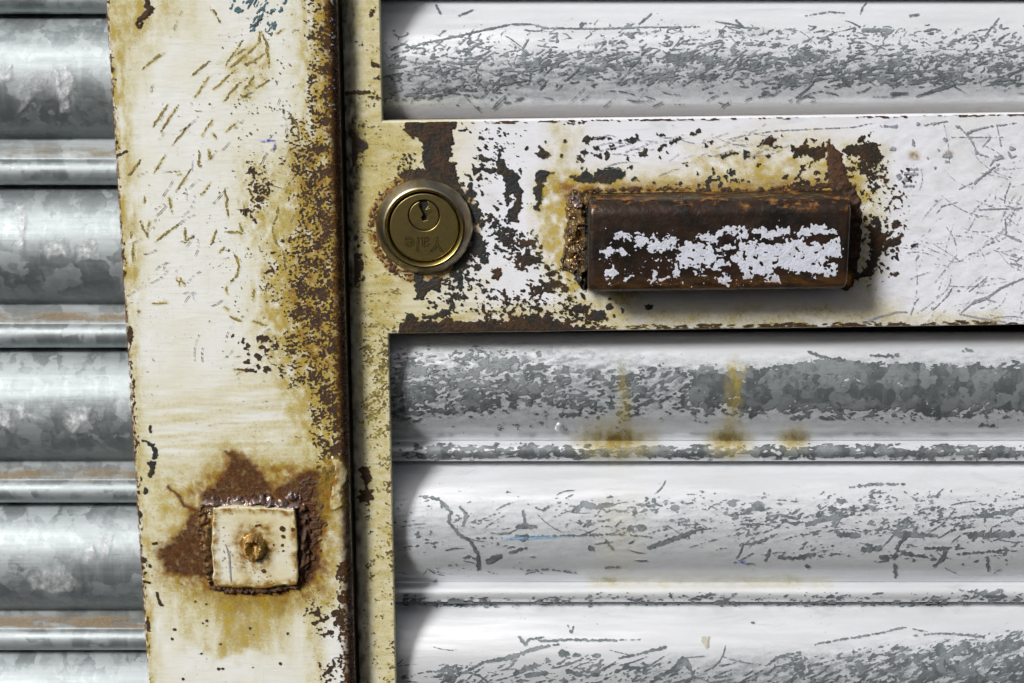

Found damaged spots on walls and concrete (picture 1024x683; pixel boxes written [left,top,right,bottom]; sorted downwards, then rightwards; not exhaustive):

corrosion [106,0,918,683]
peeling [230,0,1024,683]